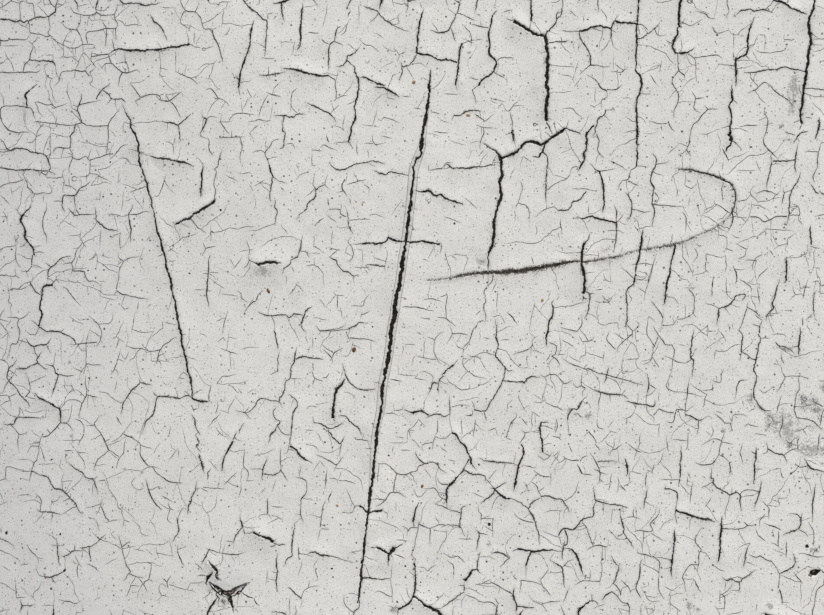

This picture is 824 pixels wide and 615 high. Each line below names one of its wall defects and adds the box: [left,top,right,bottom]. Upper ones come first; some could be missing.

crack [0,0,511,615]
crack [342,0,824,615]